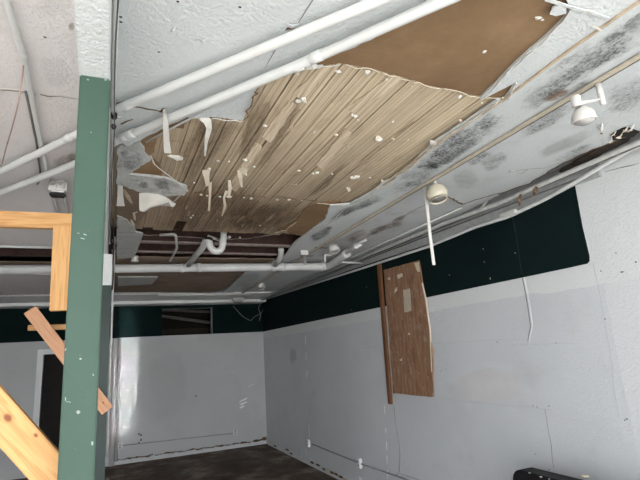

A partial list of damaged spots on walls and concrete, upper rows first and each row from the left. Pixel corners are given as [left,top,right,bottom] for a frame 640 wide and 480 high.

peeling [117,155,188,236]
peeling [163,109,183,161]
peeling [199,158,255,216]
peeling [200,88,259,156]
peeling [295,5,571,242]
spalling [449,123,640,205]